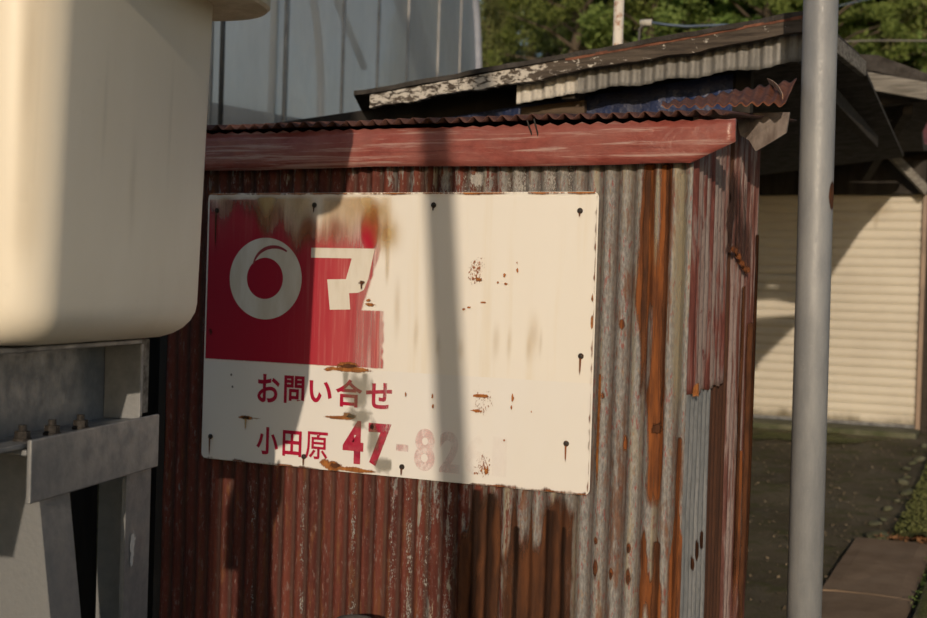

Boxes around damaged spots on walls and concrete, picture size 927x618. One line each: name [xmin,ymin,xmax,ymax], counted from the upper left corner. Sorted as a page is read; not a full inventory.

corrosion [209,193,410,223]
corrosion [275,458,374,473]
corrosion [324,362,371,373]
corrosion [457,346,605,618]
corrosion [635,164,672,504]
corrosion [626,438,703,618]
corrosion [733,235,759,618]